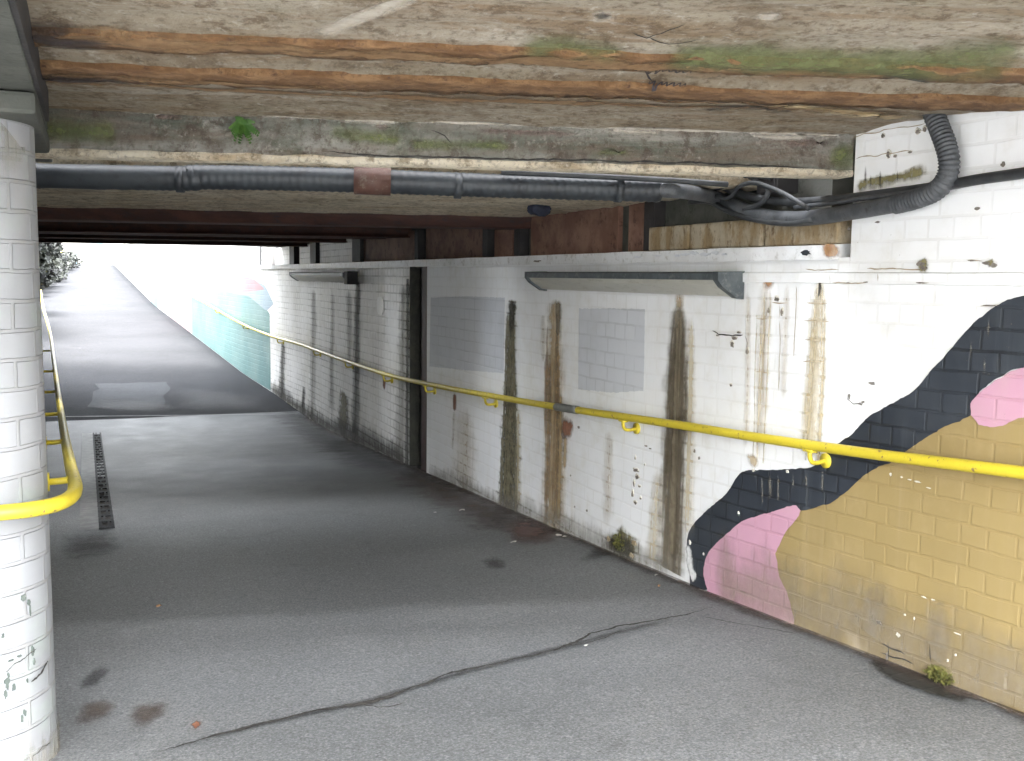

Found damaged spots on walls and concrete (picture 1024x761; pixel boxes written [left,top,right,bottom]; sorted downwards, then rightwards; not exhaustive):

leakage [302,300,315,408]
leakage [330,282,360,433]
leakage [500,301,520,511]
corrosion [544,303,580,528]
peeling [631,445,651,505]
leakage [651,296,693,575]
peeling [3,646,36,699]
crack [152,608,798,753]
leakage [873,661,968,701]